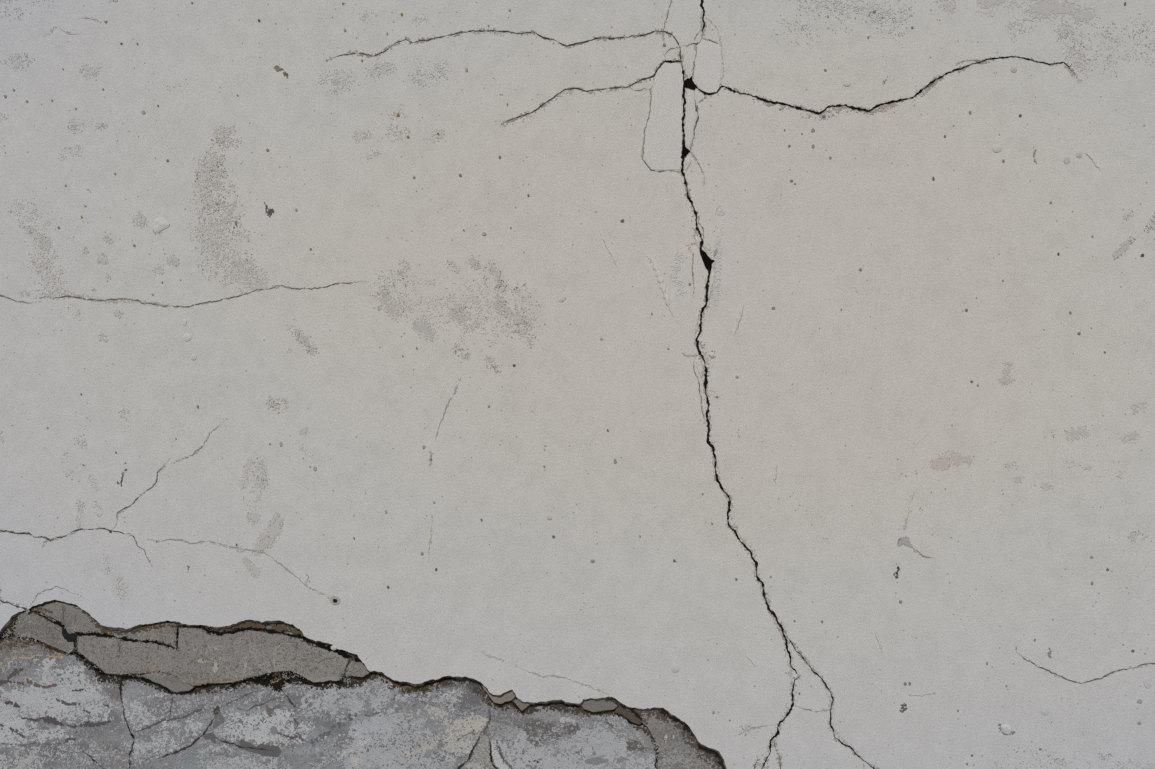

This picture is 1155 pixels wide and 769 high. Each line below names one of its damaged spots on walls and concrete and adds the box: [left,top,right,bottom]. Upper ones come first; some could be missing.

crack [0,280,369,308]
crack [326,0,1078,769]
crack [0,418,330,599]
peeling [0,600,727,769]
crack [1015,646,1155,683]